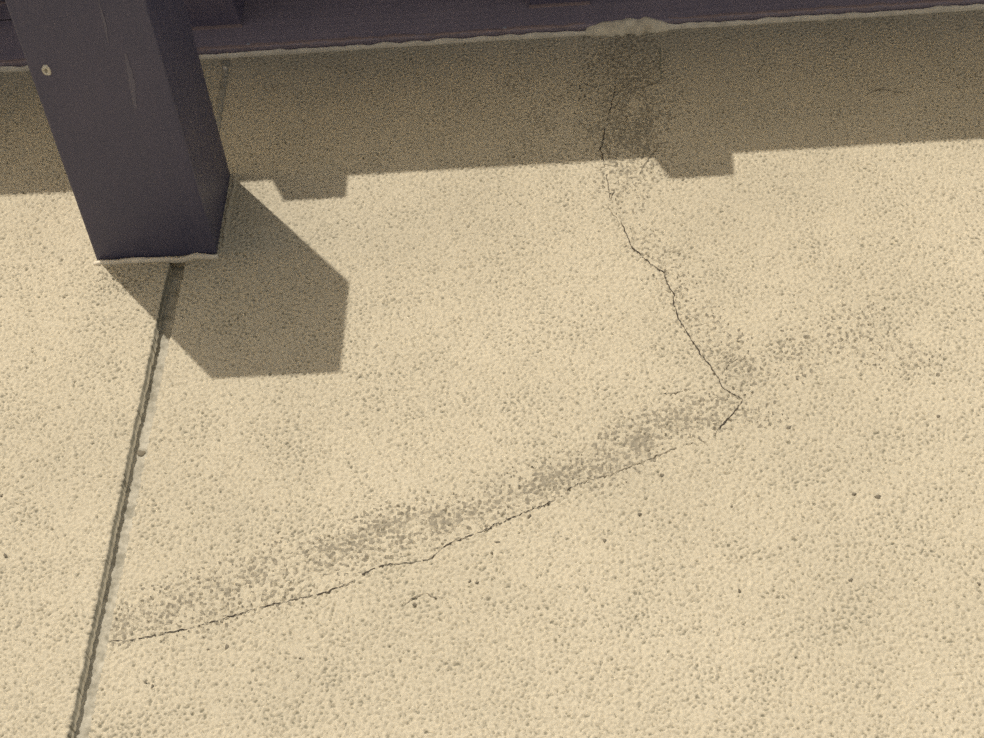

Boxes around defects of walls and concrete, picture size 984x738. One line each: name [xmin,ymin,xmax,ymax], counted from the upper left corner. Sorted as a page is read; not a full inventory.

crack [109,47,745,642]
water stain [110,33,944,653]